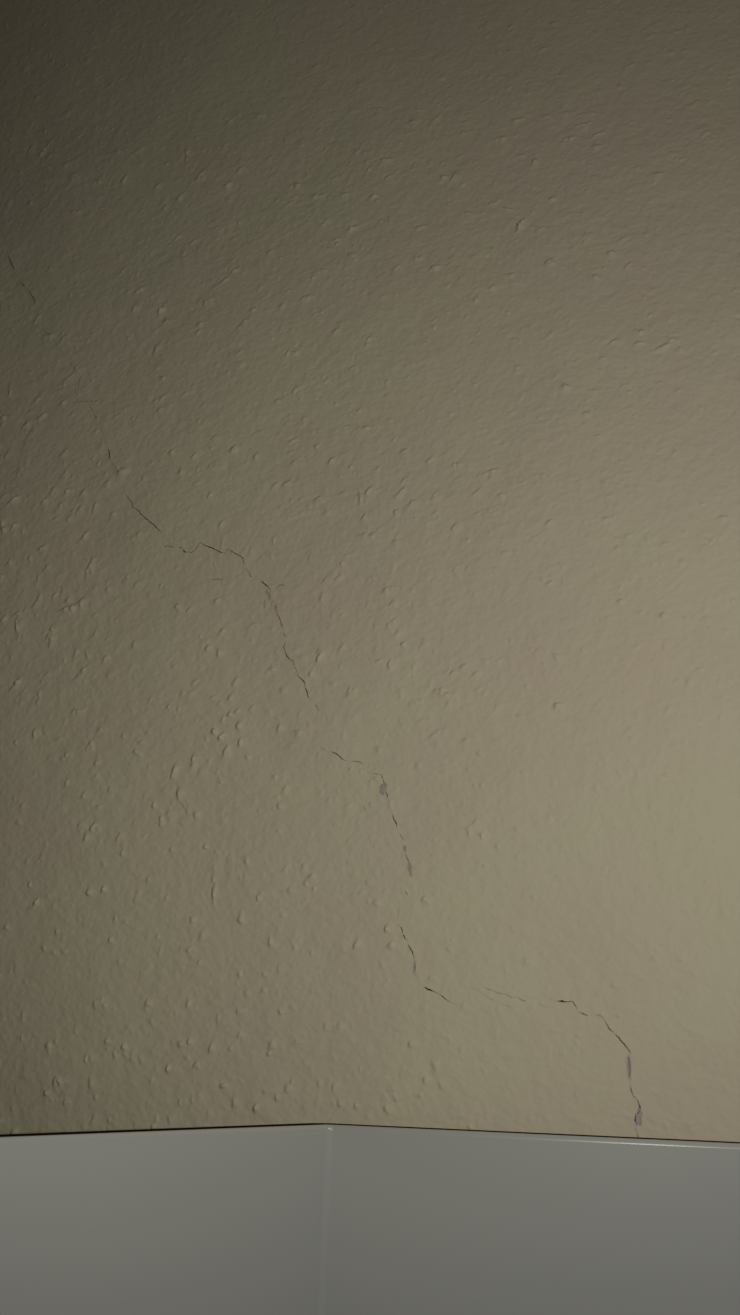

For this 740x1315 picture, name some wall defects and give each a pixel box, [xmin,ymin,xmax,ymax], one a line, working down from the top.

crack [128,498,318,709]
crack [559,1000,640,1136]